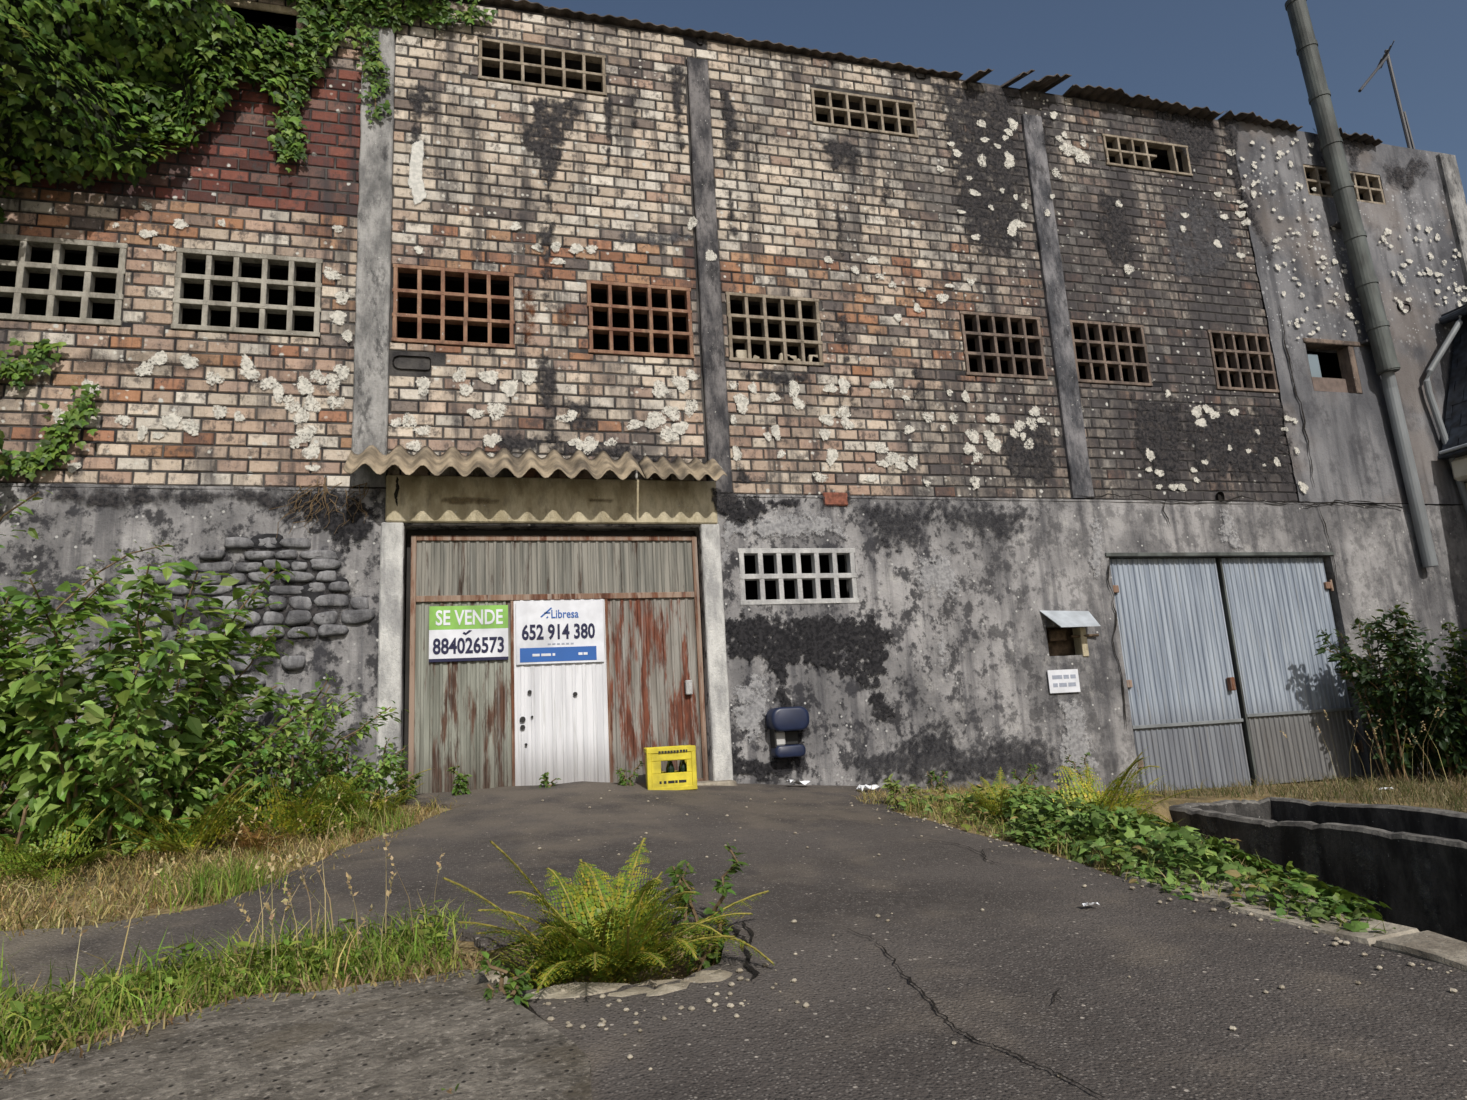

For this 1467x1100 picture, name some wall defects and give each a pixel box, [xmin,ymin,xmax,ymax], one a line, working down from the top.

damp [603,98,613,167]
damp [668,64,687,147]
damp [520,97,582,302]
damp [933,82,1027,274]
damp [1096,190,1135,274]
damp [24,487,381,552]
mould [850,500,1042,550]
spalling [139,534,376,688]
mould [725,613,896,724]
mould [732,727,810,781]
damp [845,699,1099,785]